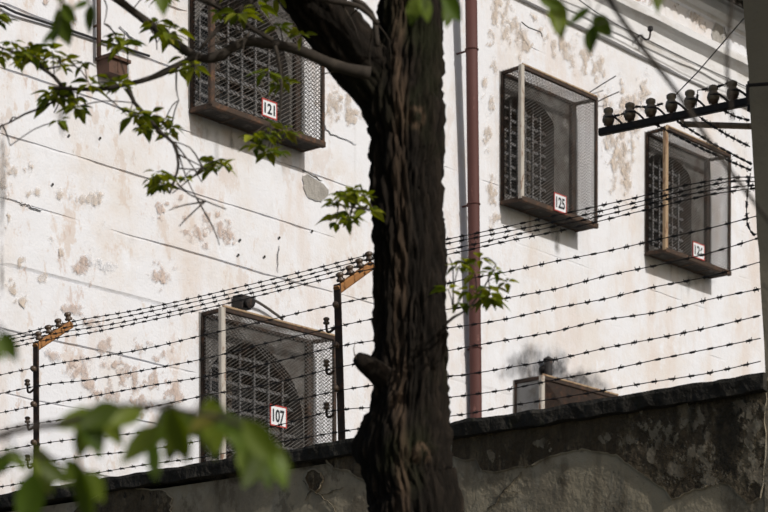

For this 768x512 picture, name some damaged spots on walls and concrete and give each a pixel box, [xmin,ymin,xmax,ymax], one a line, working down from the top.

peeling [486,0,533,59]
peeling [533,14,605,82]
peeling [184,212,235,249]
peeling [74,255,112,274]
peeling [153,262,168,283]
spalling [451,392,768,504]